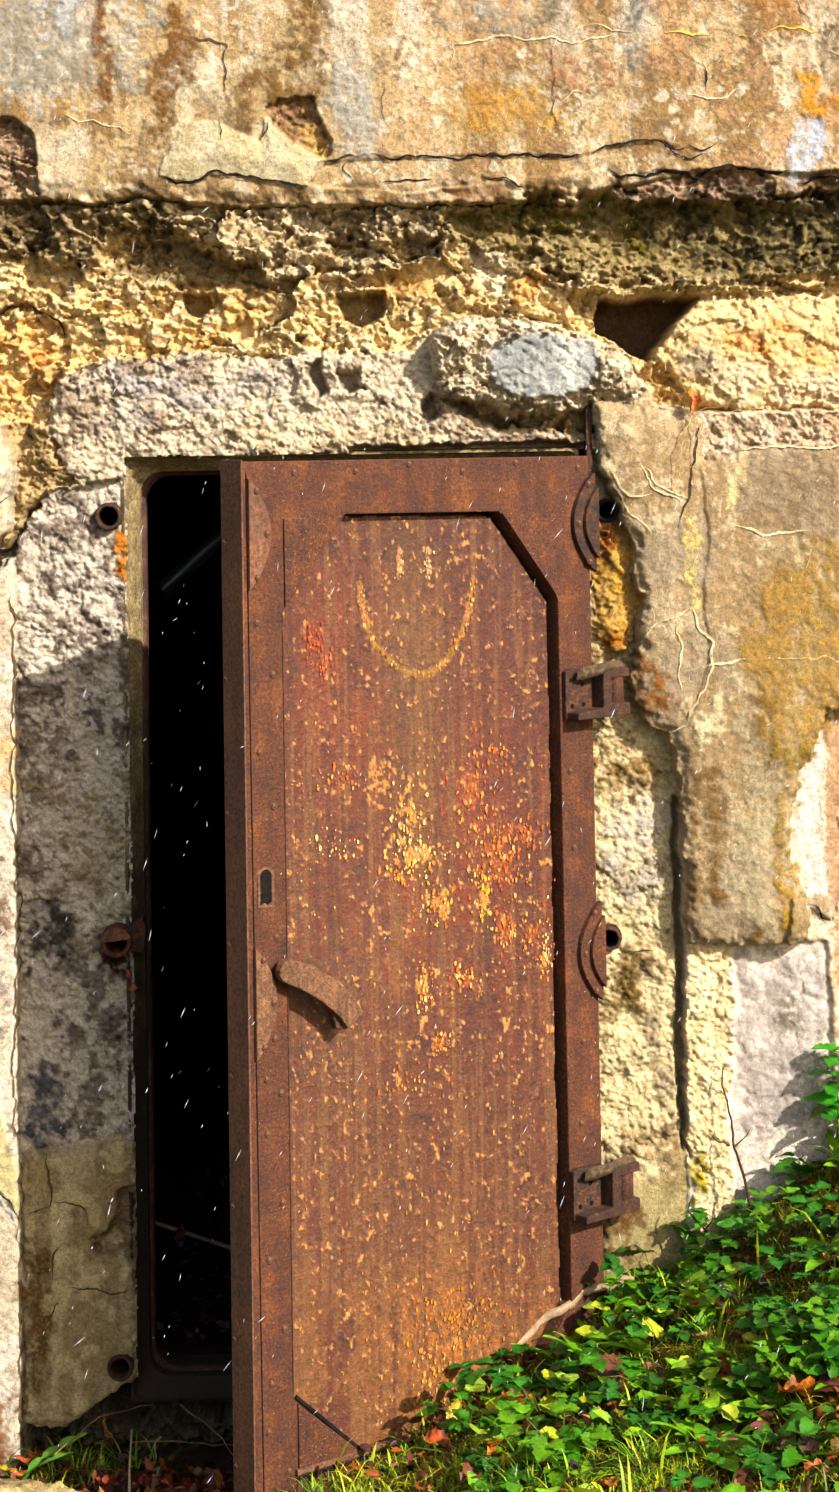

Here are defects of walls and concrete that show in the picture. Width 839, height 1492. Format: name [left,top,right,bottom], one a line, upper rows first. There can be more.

spalling [266,98,331,158]
crack [160,0,839,189]
crack [734,524,807,536]
spalling [0,117,839,1279]
rust [590,521,674,731]
crack [644,605,839,732]
damp [0,898,73,960]
spalling [0,424,233,1455]
rust [378,728,556,1014]
damp [21,1069,65,1148]
rust [364,1027,547,1180]
rust [360,1281,521,1409]